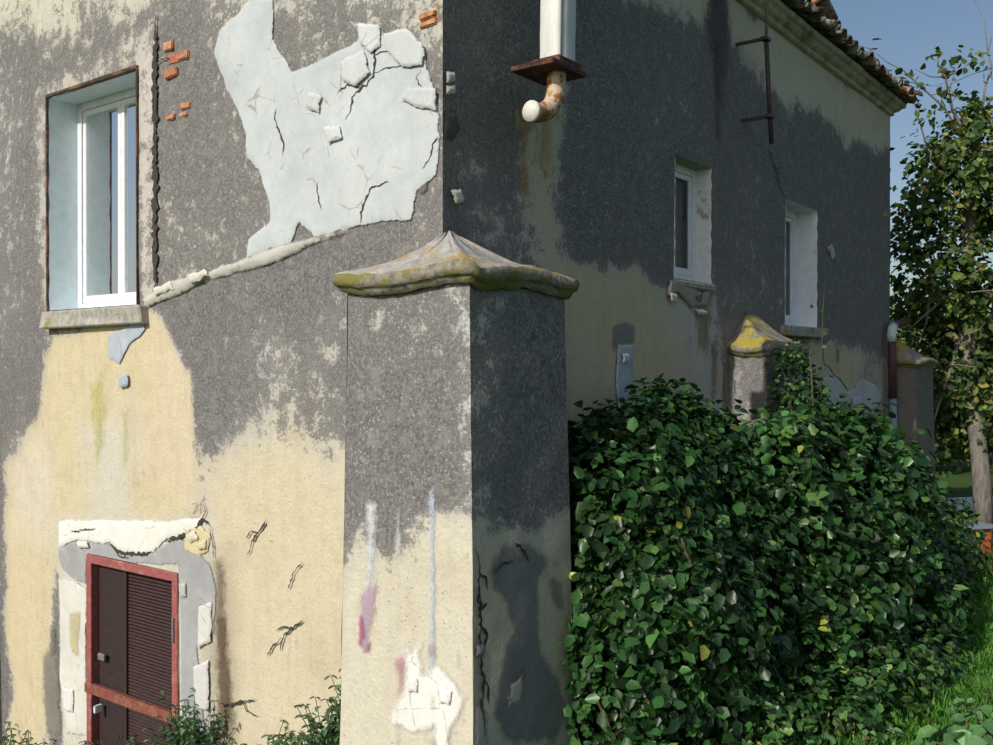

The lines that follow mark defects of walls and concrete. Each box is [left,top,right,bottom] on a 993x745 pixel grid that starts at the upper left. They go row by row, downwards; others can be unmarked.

flaking render [163,40,190,80]
flaking render [165,102,191,121]
crack [274,111,285,154]
crack [337,49,437,120]
damp [707,0,728,135]
crack [360,181,388,223]
peeling [107,324,145,388]
spalling [58,525,216,739]
crack [267,620,303,655]
crack [475,548,490,735]